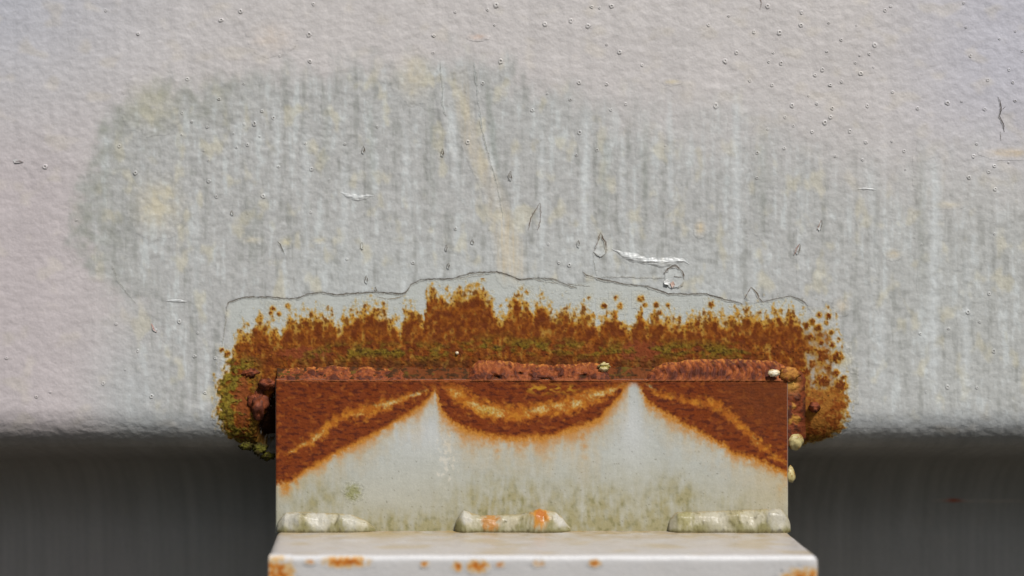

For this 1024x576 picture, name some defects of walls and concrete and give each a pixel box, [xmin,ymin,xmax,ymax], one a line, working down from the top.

damp [51,17,1024,428]
peeling [664,263,685,288]
rust [210,278,859,513]
rust [269,554,377,576]
rust [449,557,506,576]
rust [587,557,603,568]
rust [774,563,817,576]